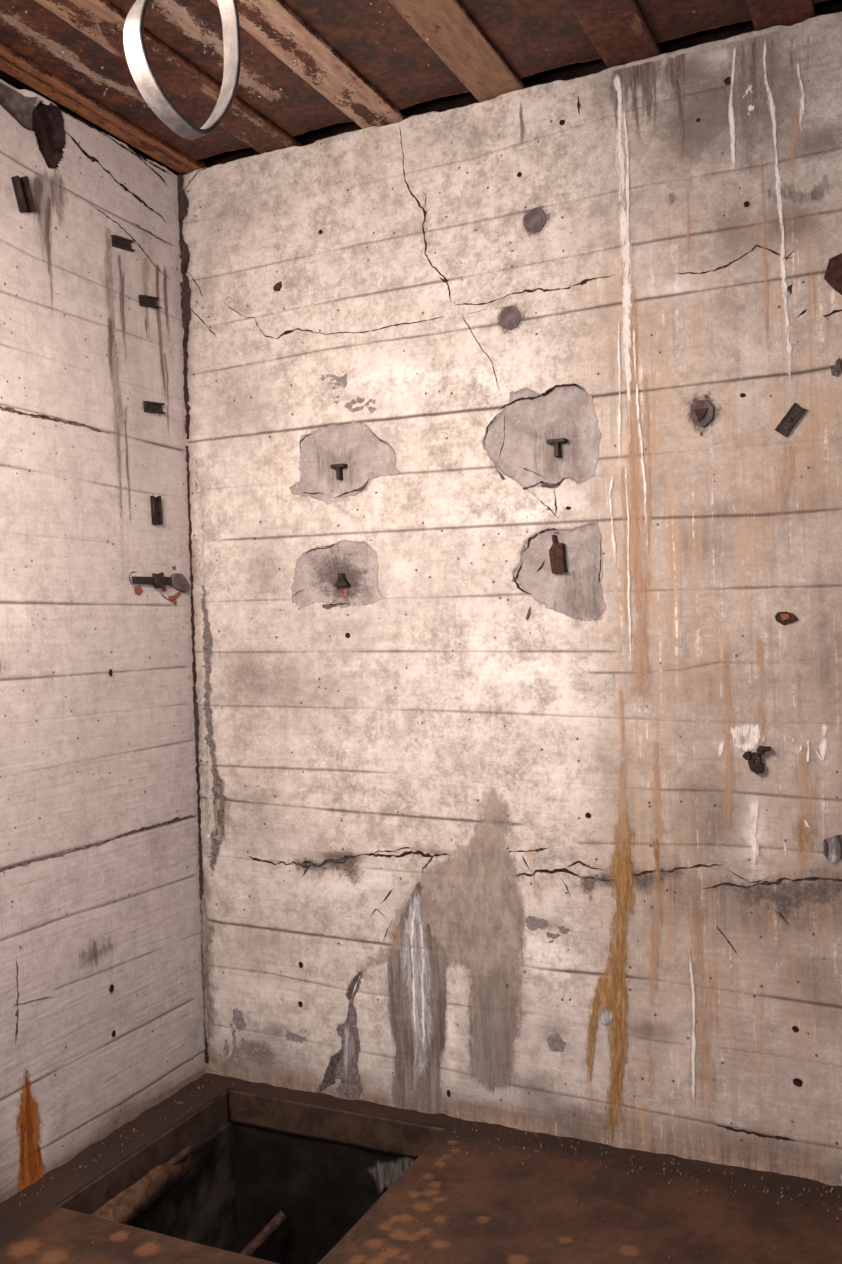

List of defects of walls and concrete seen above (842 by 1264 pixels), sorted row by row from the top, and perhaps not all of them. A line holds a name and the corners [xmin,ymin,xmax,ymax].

crack [0,102,612,1063]
spalling [291,541,382,609]
spalling [289,374,399,504]
spalling [482,383,605,621]
water stain [610,53,685,543]
crack [678,244,842,321]
water stain [728,31,828,375]
water stain [365,790,524,1114]
corrosion [586,765,635,1137]
crack [508,848,842,925]
corrosion [17,1070,45,1192]
spalling [55,971,445,1264]